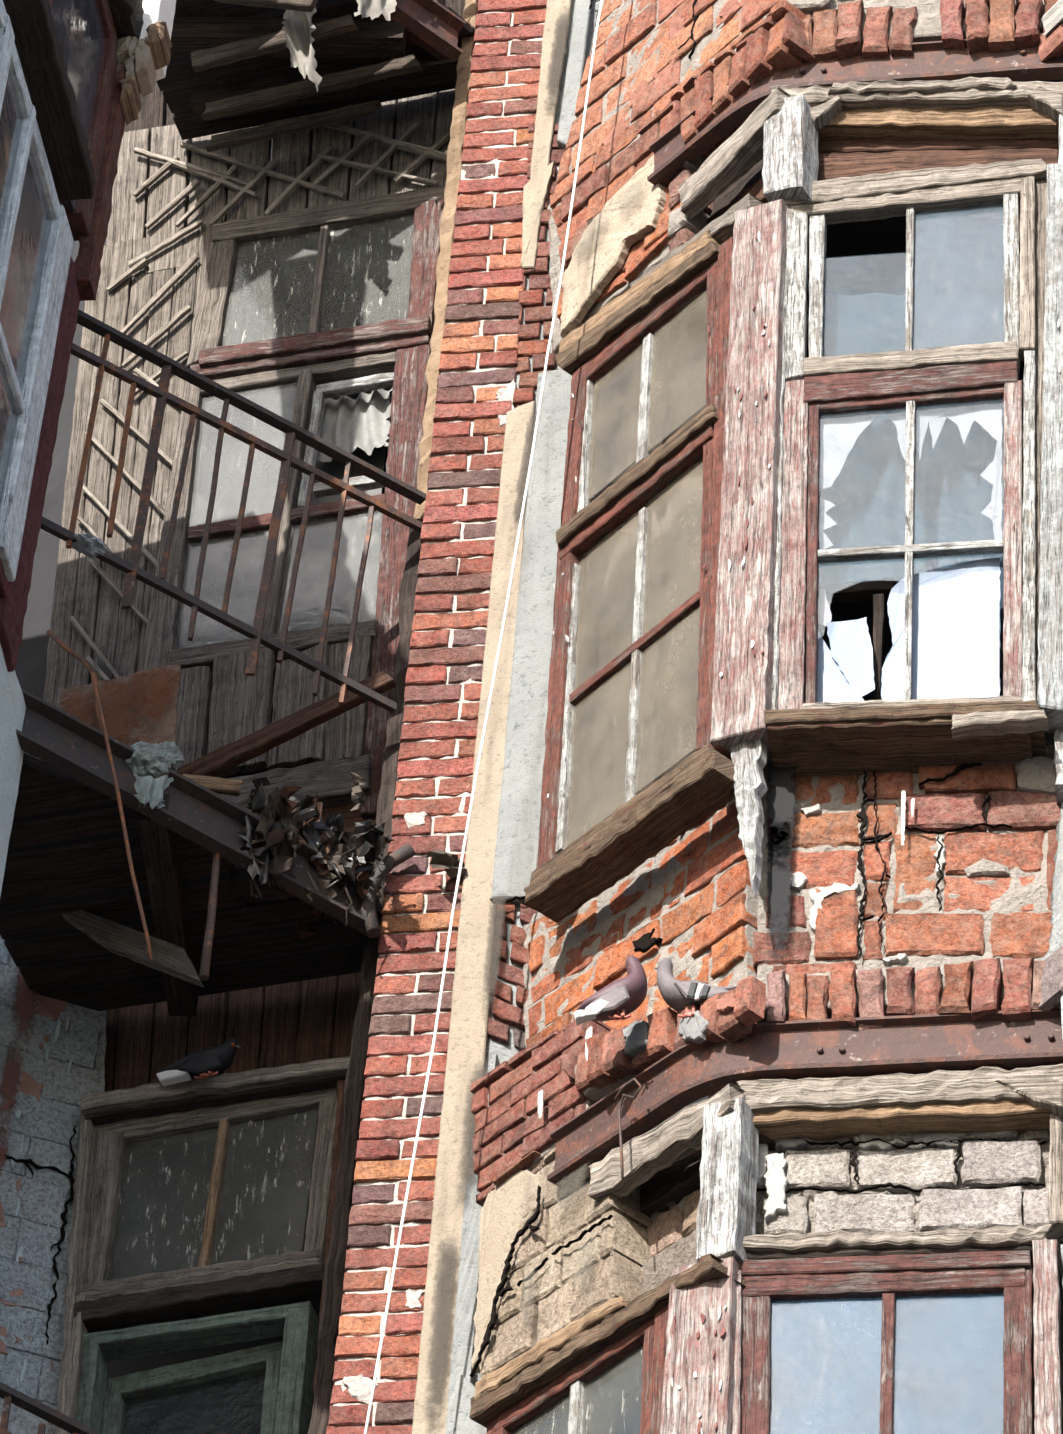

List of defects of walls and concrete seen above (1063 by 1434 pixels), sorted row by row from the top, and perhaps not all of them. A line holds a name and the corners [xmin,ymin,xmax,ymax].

crack [678,0,699,60]
spalling [719,0,742,24]
peeling [728,497,753,572]
spalling [801,804,821,817]
crack [856,763,1017,960]
spalling [934,837,946,877]
spalling [790,872,860,932]
spalling [632,928,663,953]
spalling [882,953,908,965]
spalling [602,1020,649,1063]
crack [5,1126,76,1345]
crack [469,1186,613,1378]